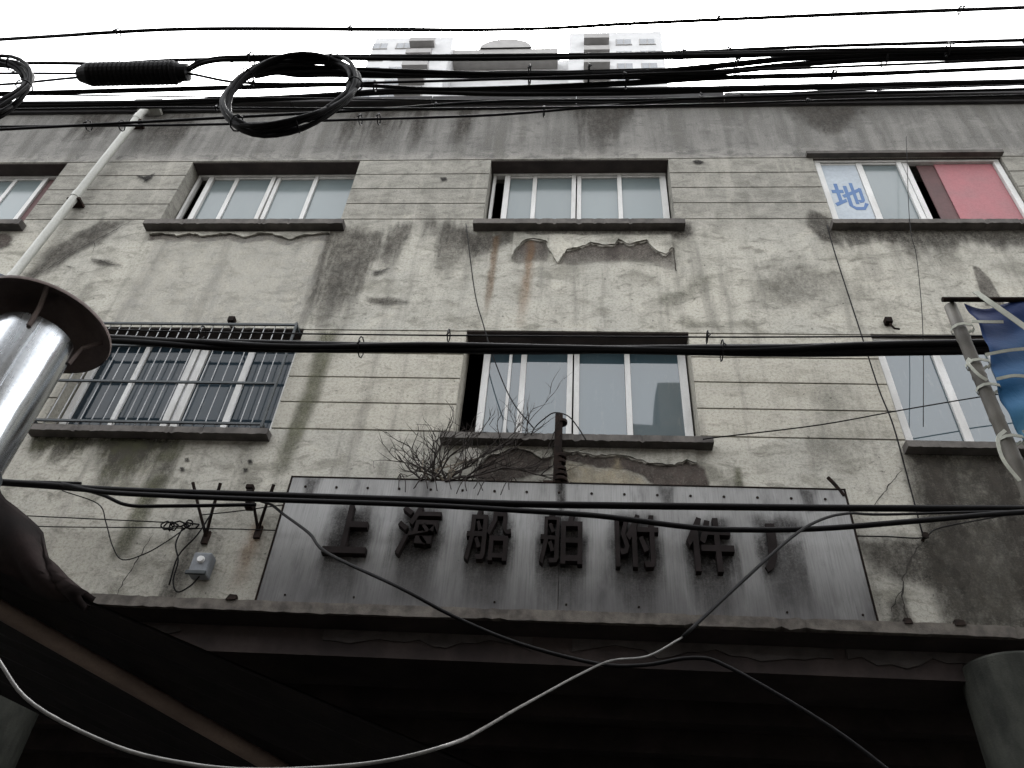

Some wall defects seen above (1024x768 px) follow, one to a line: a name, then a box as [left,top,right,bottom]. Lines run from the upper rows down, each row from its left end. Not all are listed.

flaking render [149,232,330,245]
water stain [311,225,408,307]
water stain [426,222,479,255]
flaking render [511,232,676,270]
water stain [808,212,1024,250]
flaking render [455,445,709,485]
water stain [32,436,185,551]
crack [891,544,922,618]